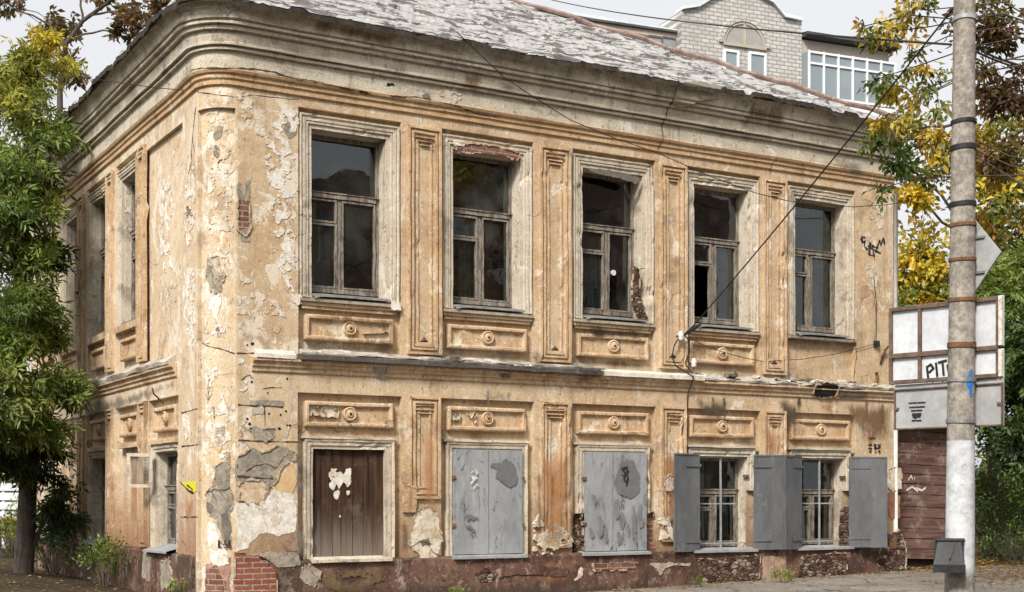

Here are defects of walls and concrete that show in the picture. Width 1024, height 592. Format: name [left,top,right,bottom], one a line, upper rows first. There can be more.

flaking render [453,140,521,161]
peeling [158,109,252,347]
peeling [237,92,302,333]
flaking render [631,266,648,319]
peeling [204,357,389,592]
peeling [407,504,443,558]
flaking render [475,493,850,584]